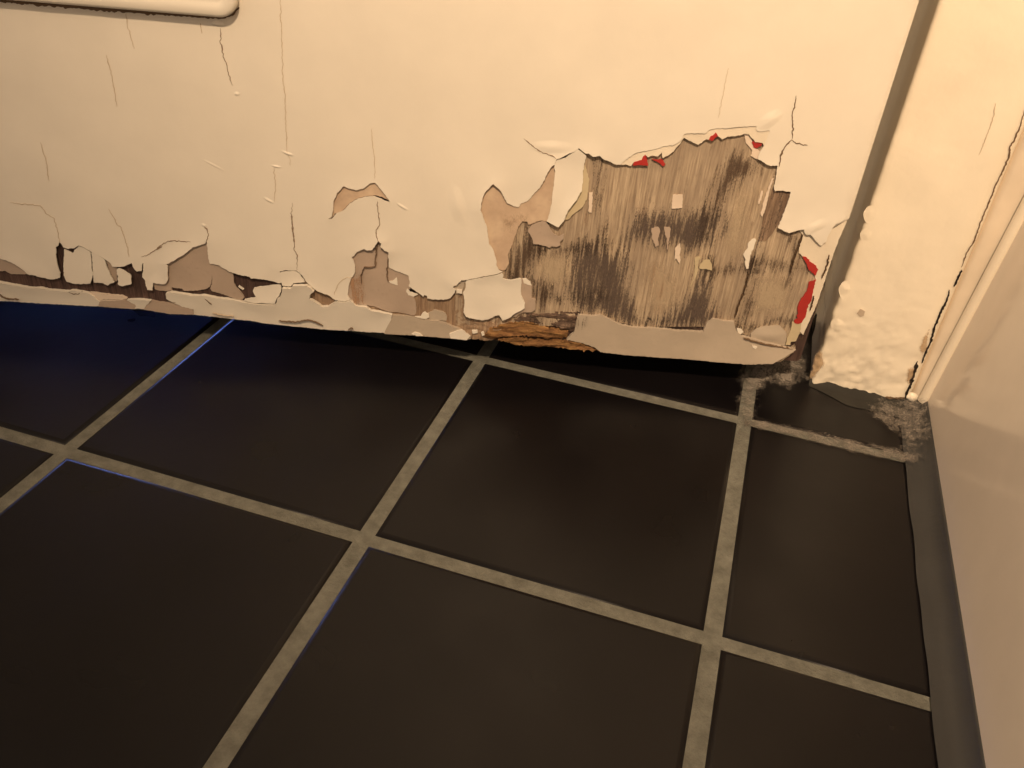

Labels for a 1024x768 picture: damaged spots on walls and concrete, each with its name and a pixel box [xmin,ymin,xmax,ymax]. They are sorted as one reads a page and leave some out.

crack [779,99,806,166]
peeling [0,241,336,315]
peeling [329,183,389,219]
peeling [348,126,847,365]
leakage [505,150,809,340]
crack [885,104,1024,400]
leakage [745,359,918,460]
leakage [875,400,930,440]